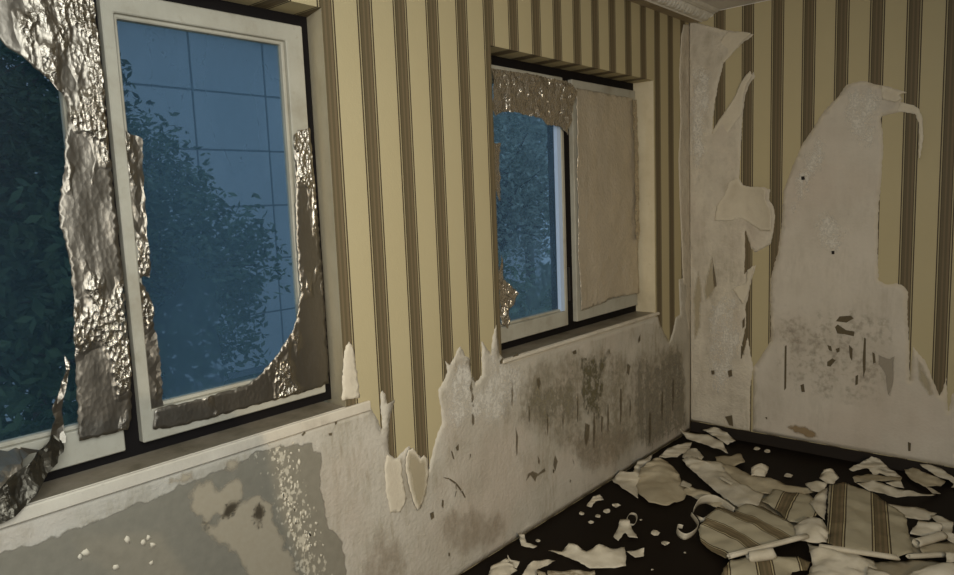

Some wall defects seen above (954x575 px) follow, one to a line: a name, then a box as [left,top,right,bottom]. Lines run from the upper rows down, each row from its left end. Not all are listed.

damp [451,348,685,461]
spalling [827,316,876,385]
damp [879,356,894,394]
damp [527,456,558,481]
spalling [0,432,346,575]